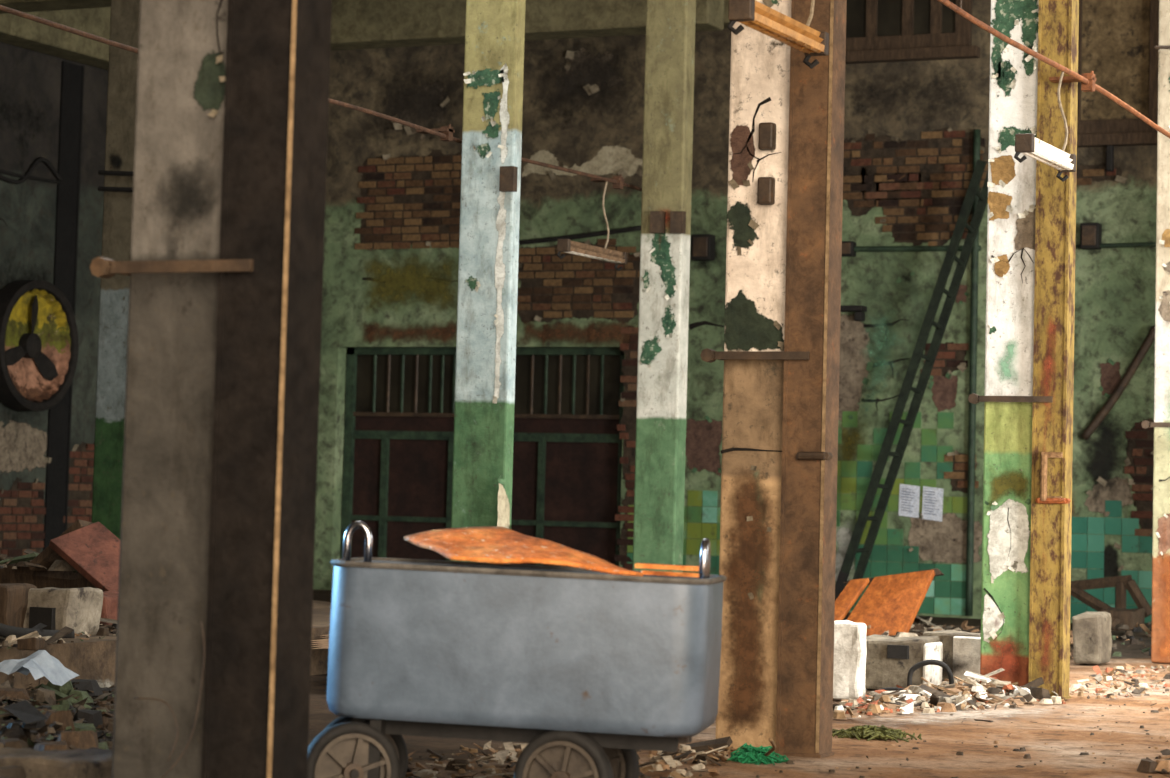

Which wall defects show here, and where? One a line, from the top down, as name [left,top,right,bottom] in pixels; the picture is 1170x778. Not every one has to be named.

peeling [991,0,1039,97]
flaking render [354,63,510,251]
peeling [465,276,481,292]
peeling [522,145,643,181]
flaking render [727,125,759,256]
flaking render [843,126,1037,279]
spalling [1158,290,1170,322]
spalling [1159,229,1170,247]
flaking render [492,191,678,570]
flaking render [0,419,52,557]
flaking render [63,442,94,529]
peeling [908,498,1031,643]